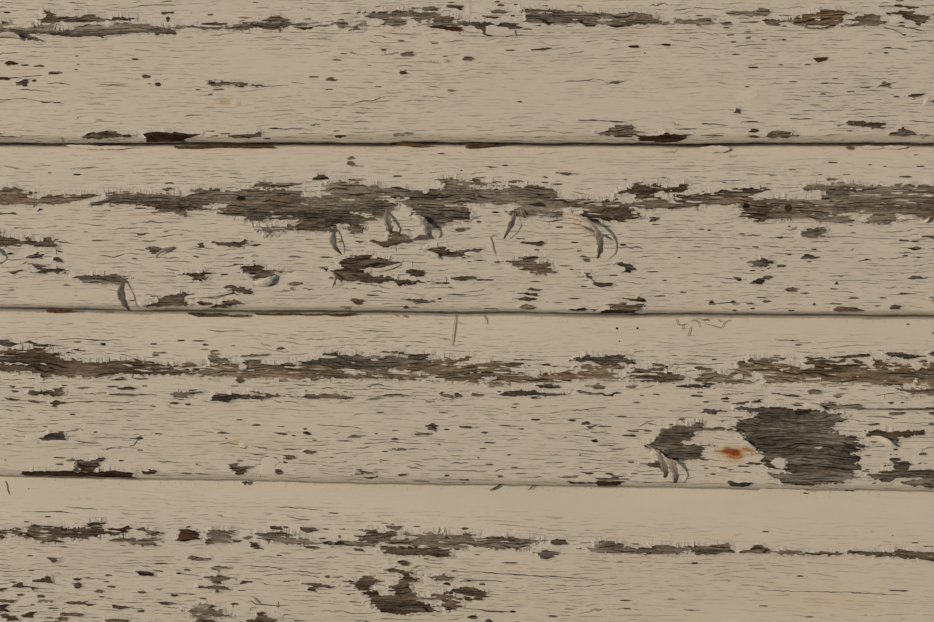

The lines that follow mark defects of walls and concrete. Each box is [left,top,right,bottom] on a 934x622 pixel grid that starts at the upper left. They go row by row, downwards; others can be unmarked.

peeling [0,2,934,43]
peeling [875,79,892,88]
peeling [0,156,934,315]
peeling [0,335,934,491]
corrosion [715,448,756,459]
peeling [0,517,570,622]
peeling [585,535,934,564]